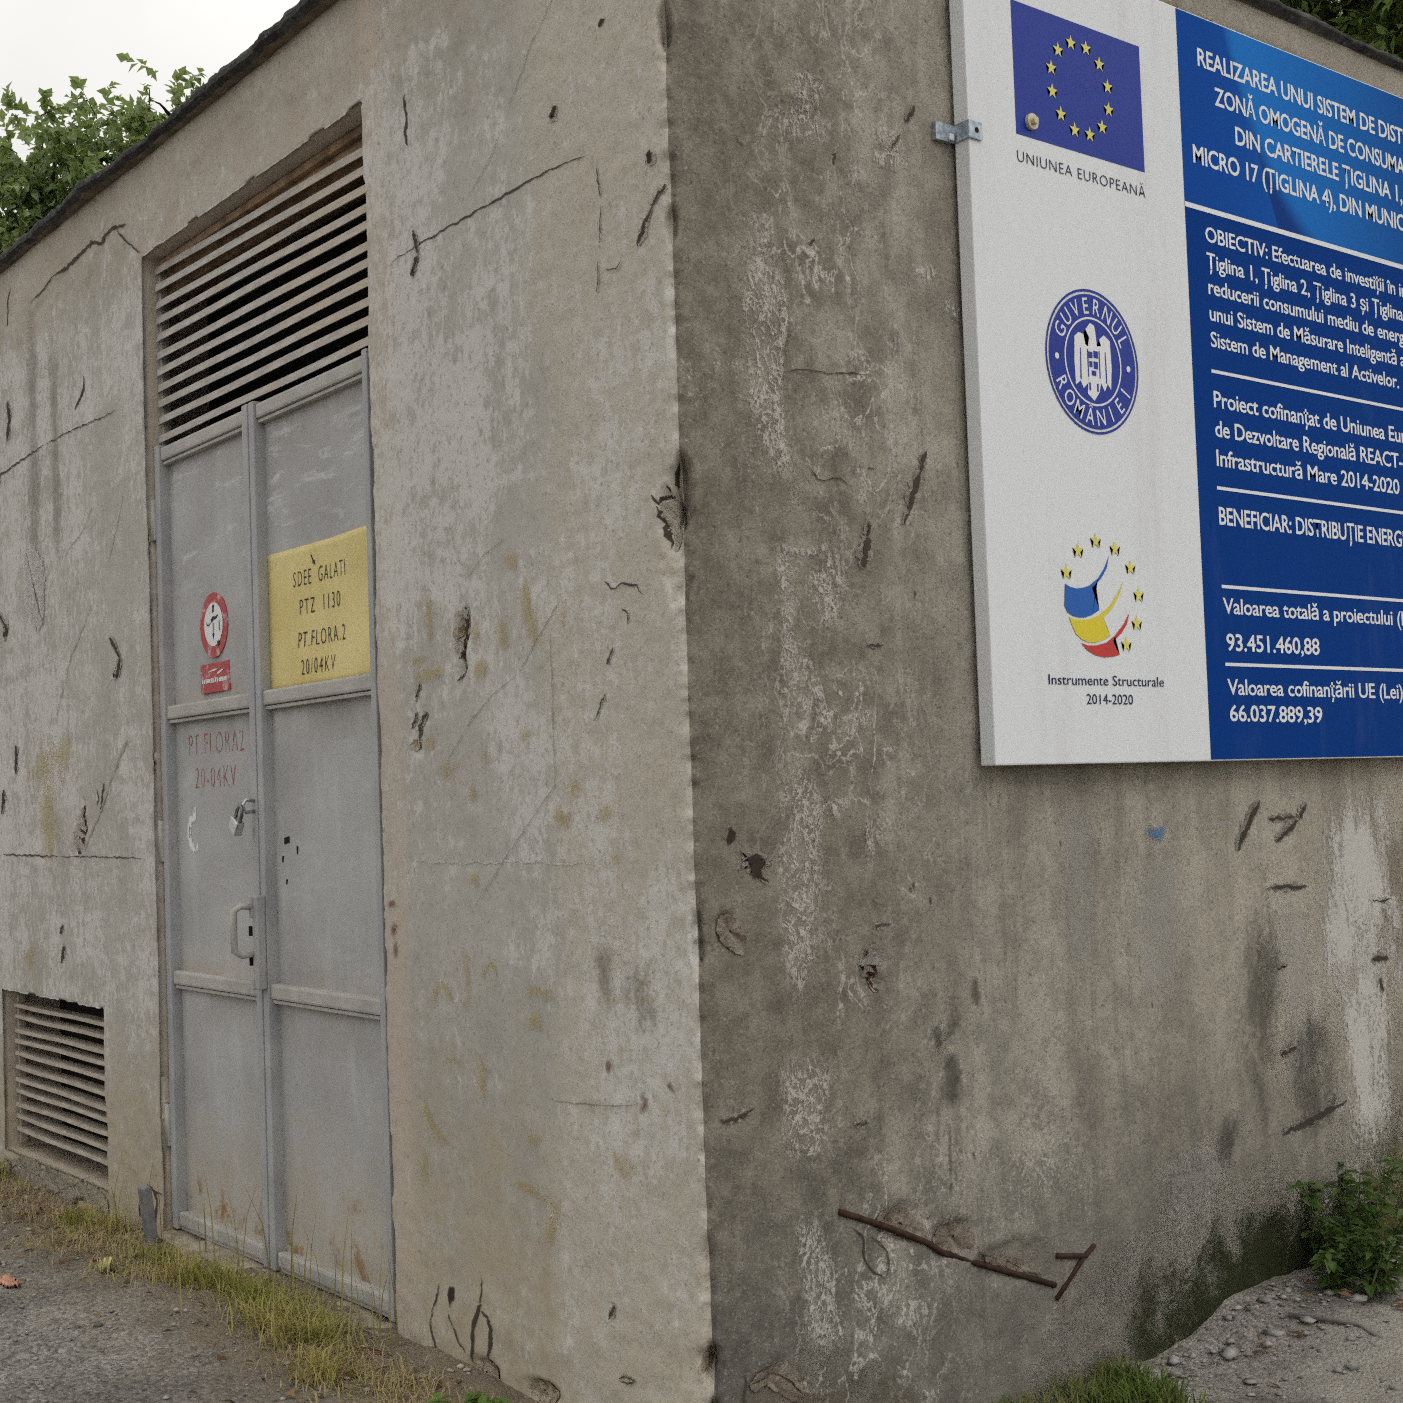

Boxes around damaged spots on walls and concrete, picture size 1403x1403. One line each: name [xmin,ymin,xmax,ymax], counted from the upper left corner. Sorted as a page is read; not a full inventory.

crack [392,0,621,292]
crack [7,224,139,323]
crack [0,377,115,475]
spalling [651,463,685,551]
hole [452,605,470,681]
hole [410,681,428,751]
crack [447,603,569,904]
crack [4,852,141,860]
leakage [1104,788,1403,1366]
corrosion [838,1209,1097,1301]